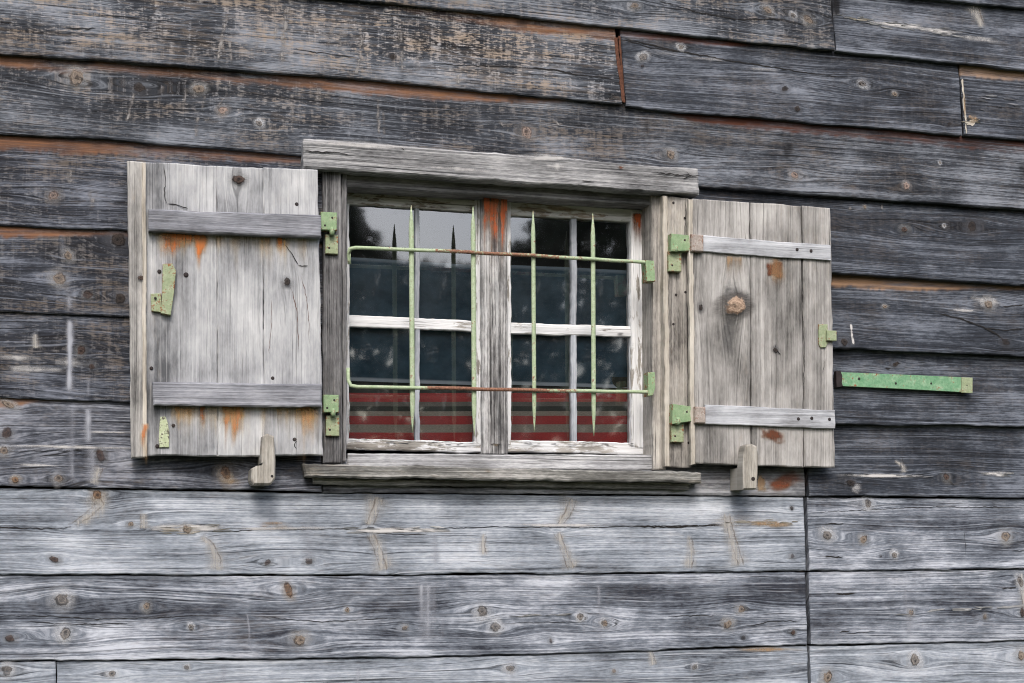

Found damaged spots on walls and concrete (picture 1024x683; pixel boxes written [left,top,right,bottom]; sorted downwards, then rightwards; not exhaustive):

corrosion [483,198,507,249]
corrosion [160,233,218,260]
corrosion [767,261,782,278]
corrosion [174,407,205,422]
corrosion [222,407,244,433]
corrosion [277,407,314,425]
corrosion [763,429,783,441]